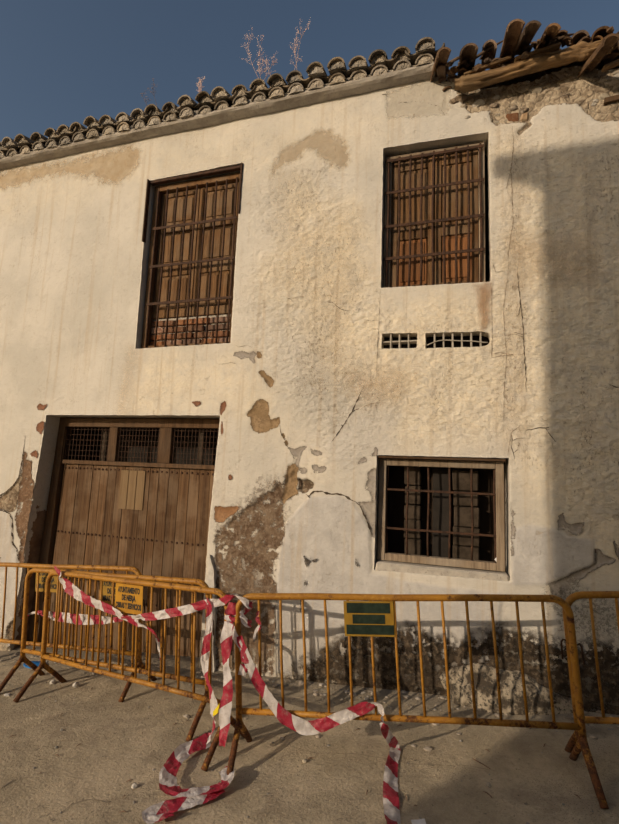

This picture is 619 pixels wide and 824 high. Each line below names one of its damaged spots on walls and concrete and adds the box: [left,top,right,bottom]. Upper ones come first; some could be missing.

flaking render [386,66,619,135]
crack [491,129,527,390]
flaking render [233,351,274,388]
crack [332,392,374,441]
crack [508,427,556,459]
crack [0,444,25,616]
flaking render [0,450,38,563]
flaking render [208,399,326,675]
crack [306,491,372,535]
flaking render [358,447,377,537]
damp [285,621,572,699]
damp [577,640,619,715]